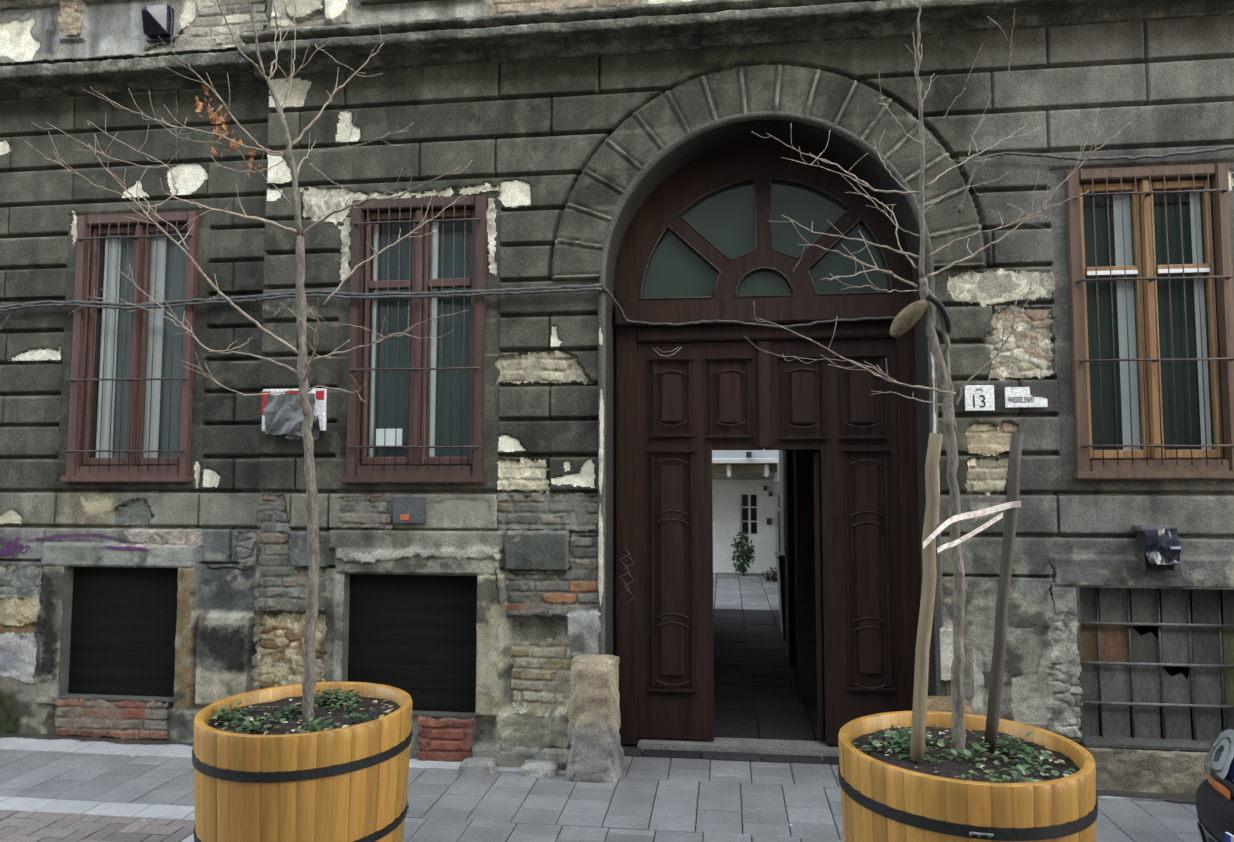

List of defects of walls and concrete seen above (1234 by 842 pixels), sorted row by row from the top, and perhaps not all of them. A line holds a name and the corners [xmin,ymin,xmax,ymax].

flaking render [488,0,698,16]
flaking render [0,17,40,61]
flaking render [0,140,11,155]
flaking render [122,181,149,198]
flaking render [167,164,209,195]
flaking render [266,154,531,280]
flaking render [947,268,1056,382]
flaking render [433,326,604,615]
flaking render [336,548,500,563]
flaking render [233,494,327,690]
flaking render [0,565,43,684]
flaking render [940,627,954,681]